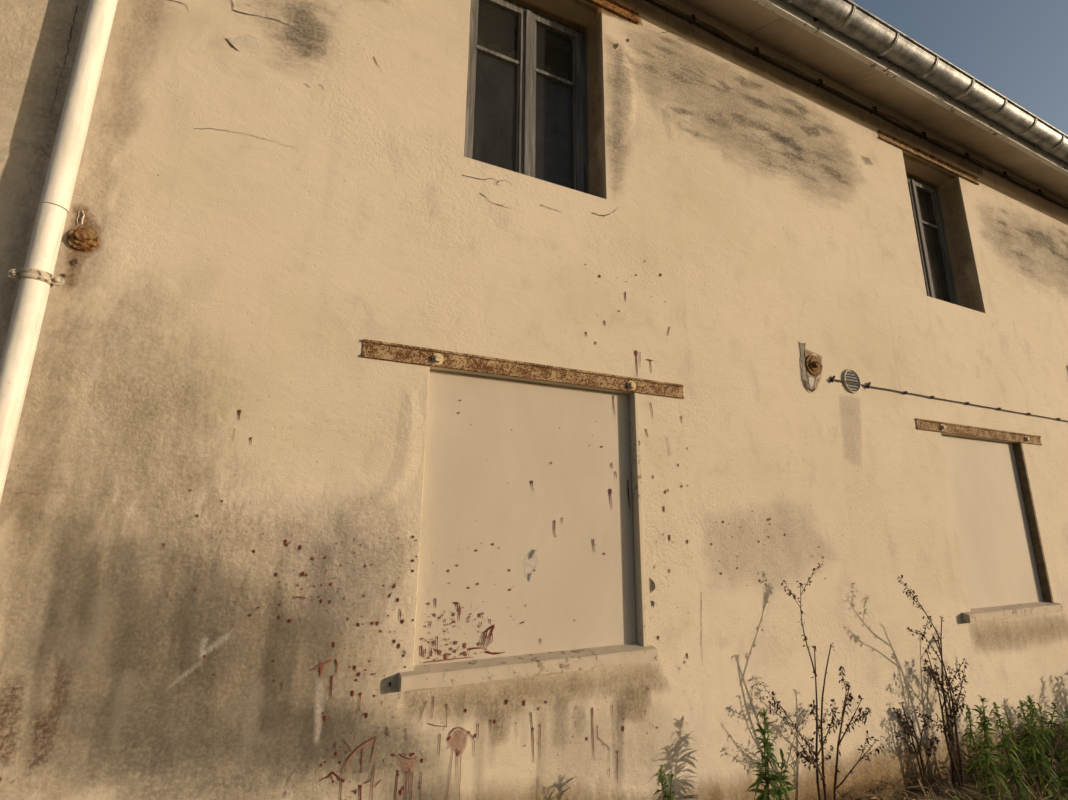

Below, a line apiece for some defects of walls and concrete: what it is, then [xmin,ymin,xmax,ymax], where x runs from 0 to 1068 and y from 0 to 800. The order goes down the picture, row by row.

crack [50,5,78,118]
crack [231,0,299,31]